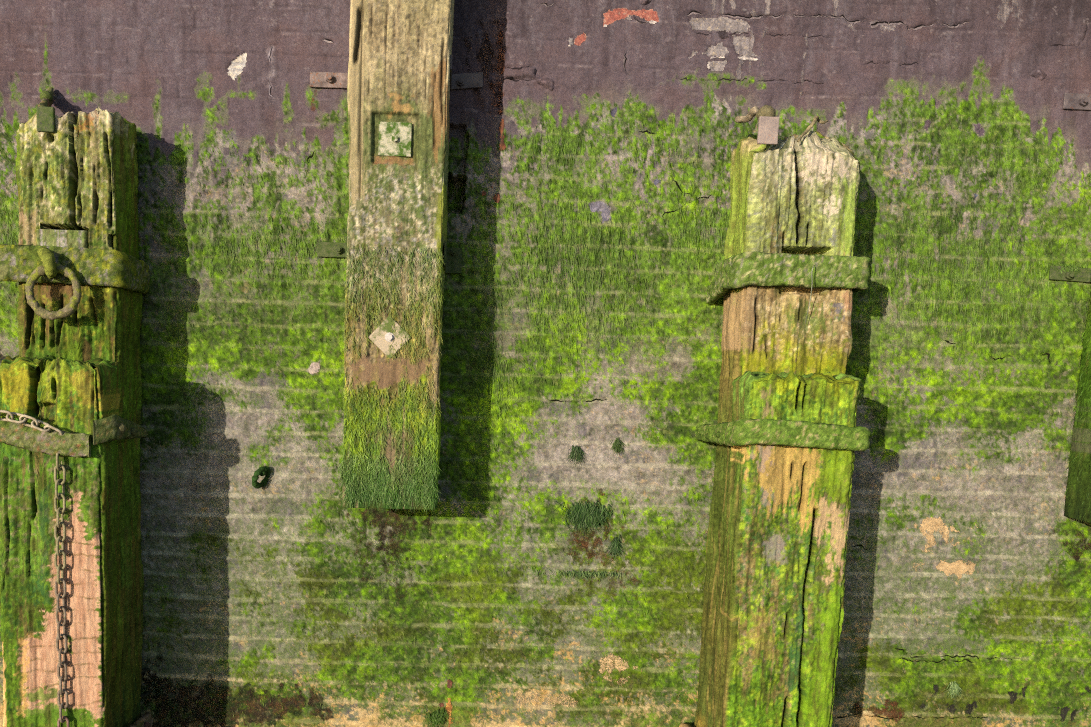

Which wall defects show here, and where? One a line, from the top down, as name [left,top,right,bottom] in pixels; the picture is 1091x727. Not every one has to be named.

spalling [603,8,659,27]
spalling [689,17,758,71]
corrosion [464,23,506,150]
crack [895,648,1024,663]